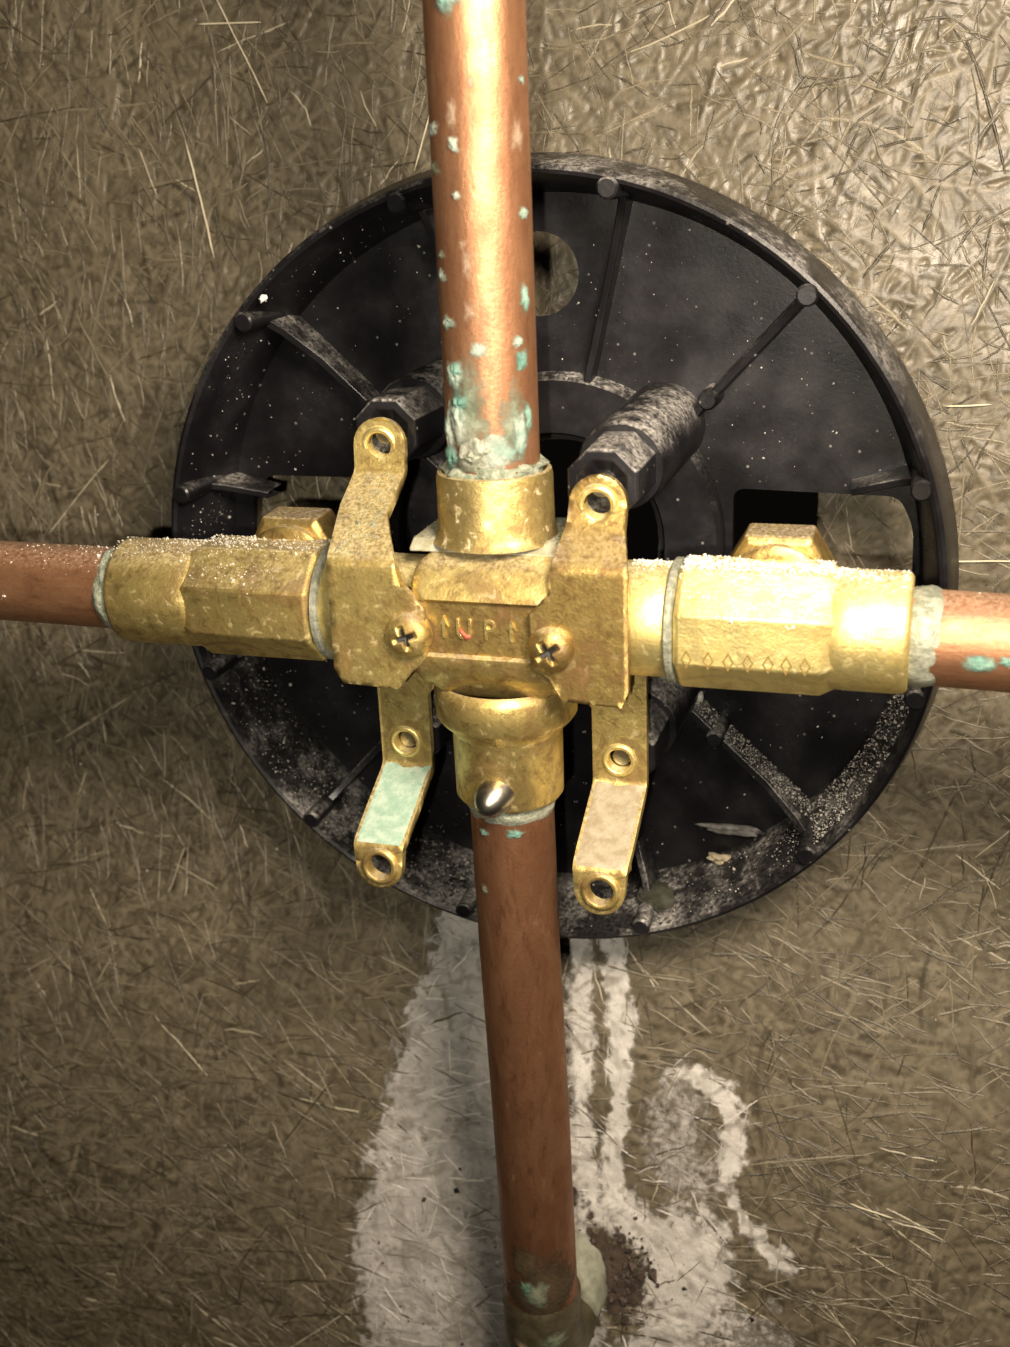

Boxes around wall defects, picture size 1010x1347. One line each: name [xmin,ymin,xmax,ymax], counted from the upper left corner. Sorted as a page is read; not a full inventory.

damp [343,911,509,1347]
damp [561,938,805,1347]